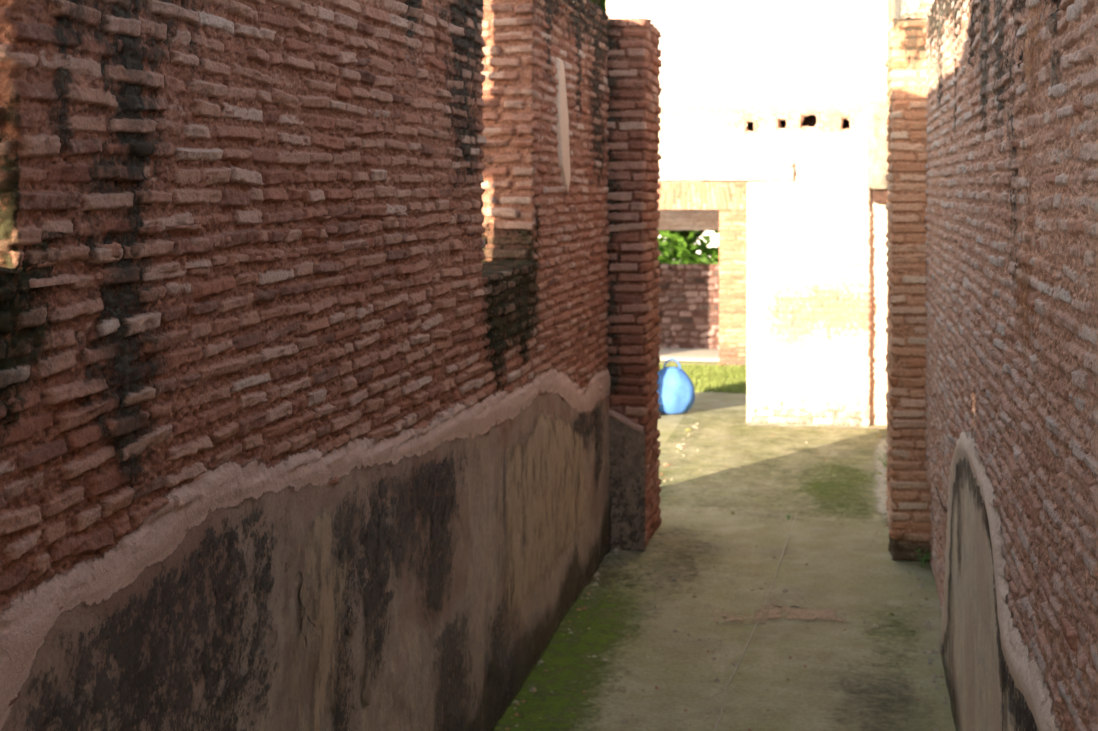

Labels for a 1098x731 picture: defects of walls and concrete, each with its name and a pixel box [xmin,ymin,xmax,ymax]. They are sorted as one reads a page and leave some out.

damp [0,94,60,450]
damp [51,0,176,155]
damp [79,131,169,484]
peeling [616,0,868,167]
damp [892,0,1026,285]
damp [26,510,276,731]
damp [318,450,622,731]
damp [941,457,1038,731]